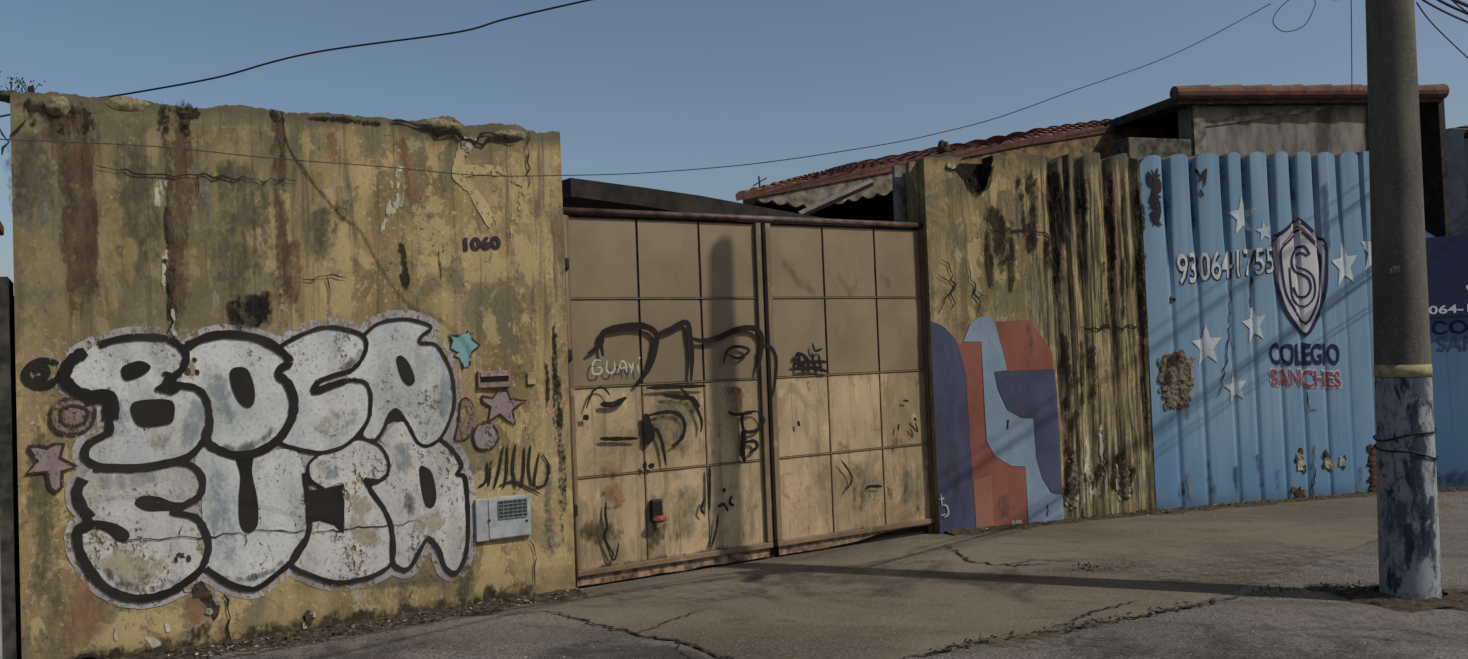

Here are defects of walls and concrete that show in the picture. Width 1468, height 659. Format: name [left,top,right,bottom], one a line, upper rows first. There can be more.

water stain [158,102,200,136]
water stain [6,98,94,225]
crack [95,165,297,208]
water stain [195,161,272,328]
water stain [953,166,1179,446]
spalling [1157,349,1195,411]
water stain [1059,333,1136,500]
spalling [1291,448,1346,498]
spalling [1367,444,1377,492]